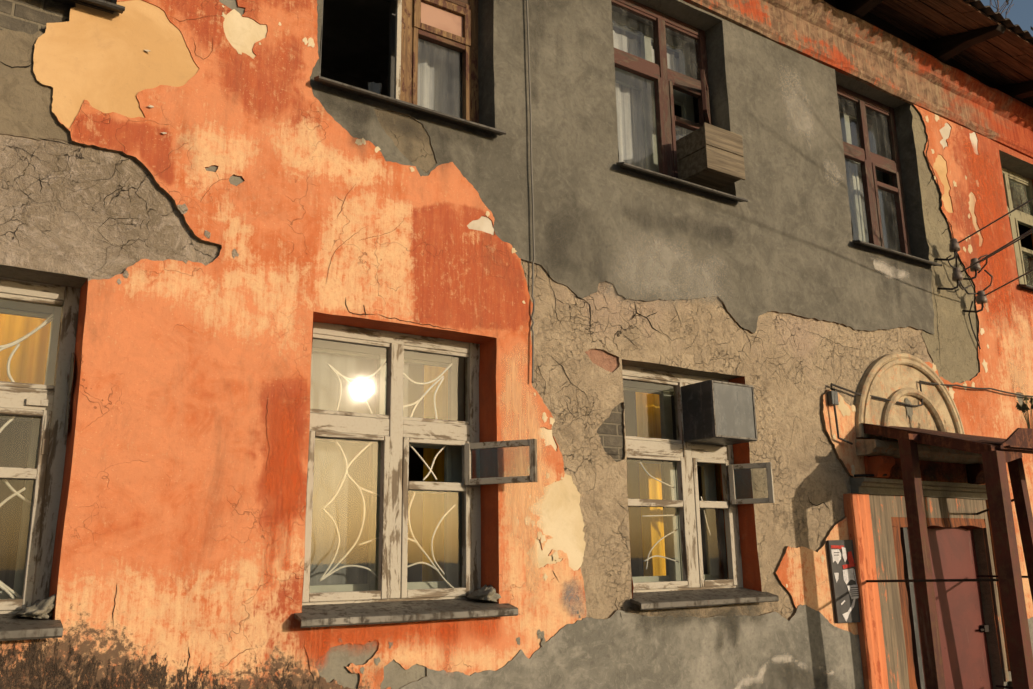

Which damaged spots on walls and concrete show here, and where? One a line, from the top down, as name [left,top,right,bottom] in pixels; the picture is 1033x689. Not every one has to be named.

peeling [219,0,281,59]
flaking render [0,0,239,284]
crack [2,137,145,265]
crack [547,268,724,366]
crack [536,356,600,429]
flaking render [467,105,989,676]
crack [737,324,802,385]
leakage [0,638,323,689]
flaking render [315,638,427,689]